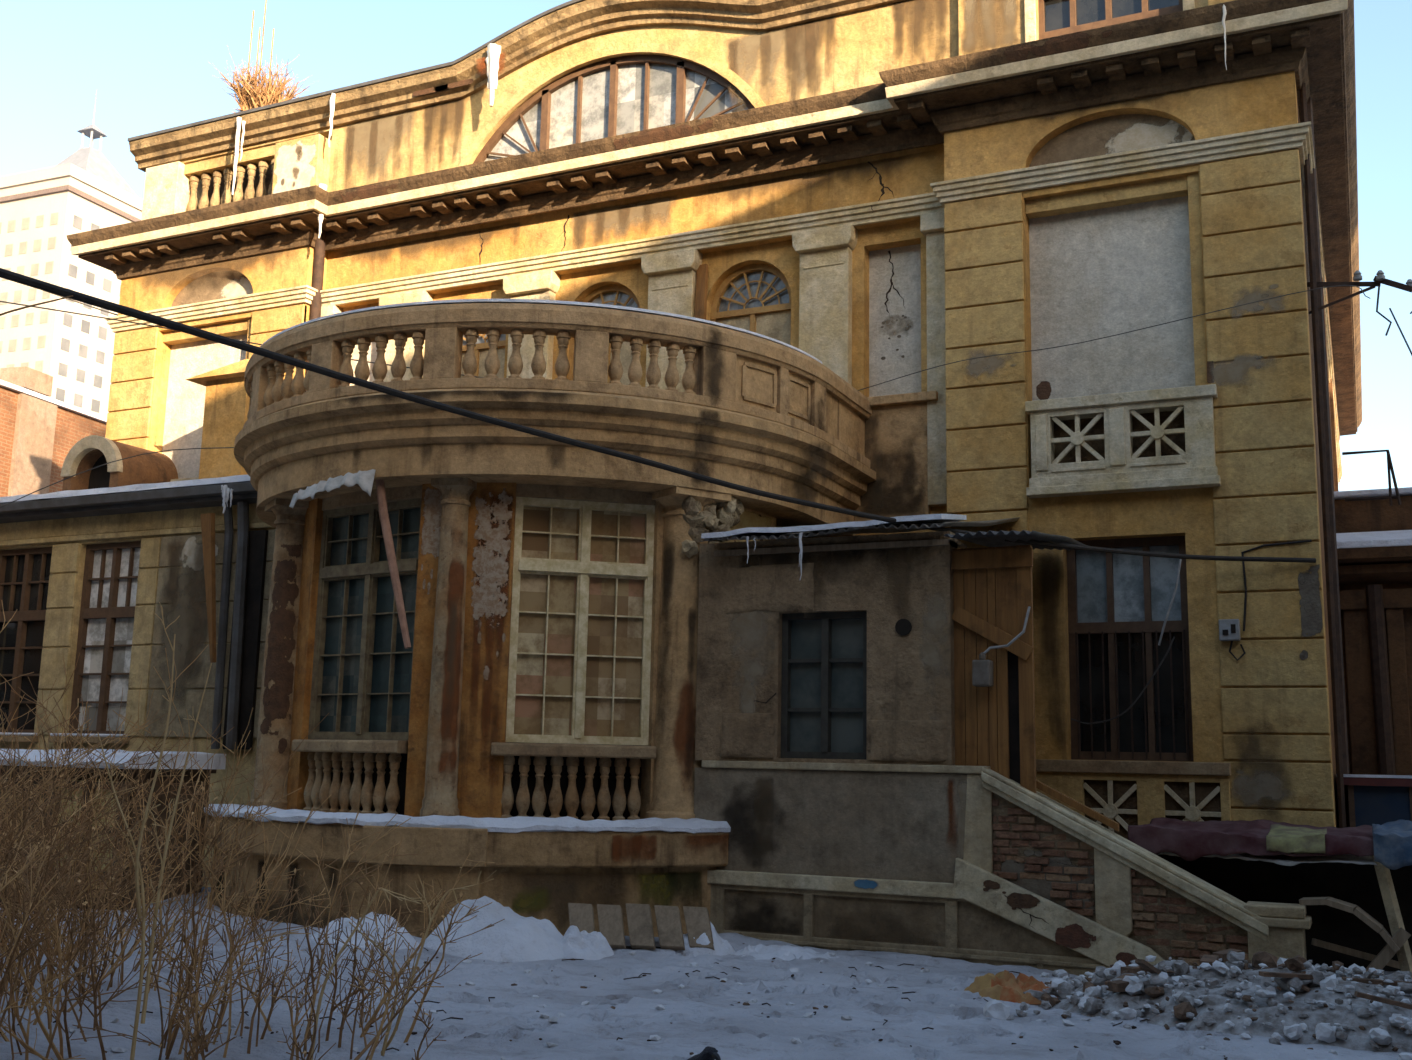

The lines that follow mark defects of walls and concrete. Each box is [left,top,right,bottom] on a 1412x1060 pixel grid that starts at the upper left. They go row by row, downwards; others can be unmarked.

water stain [729,16,834,97]
water stain [893,0,947,49]
water stain [963,0,1019,52]
water stain [330,94,464,174]
peeling [1105,120,1193,155]
crack [884,251,904,315]
peeling [471,488,513,680]
rust [439,496,512,773]
water stain [724,779,773,858]
spalling [983,880,1040,910]
spalling [1055,924,1096,949]